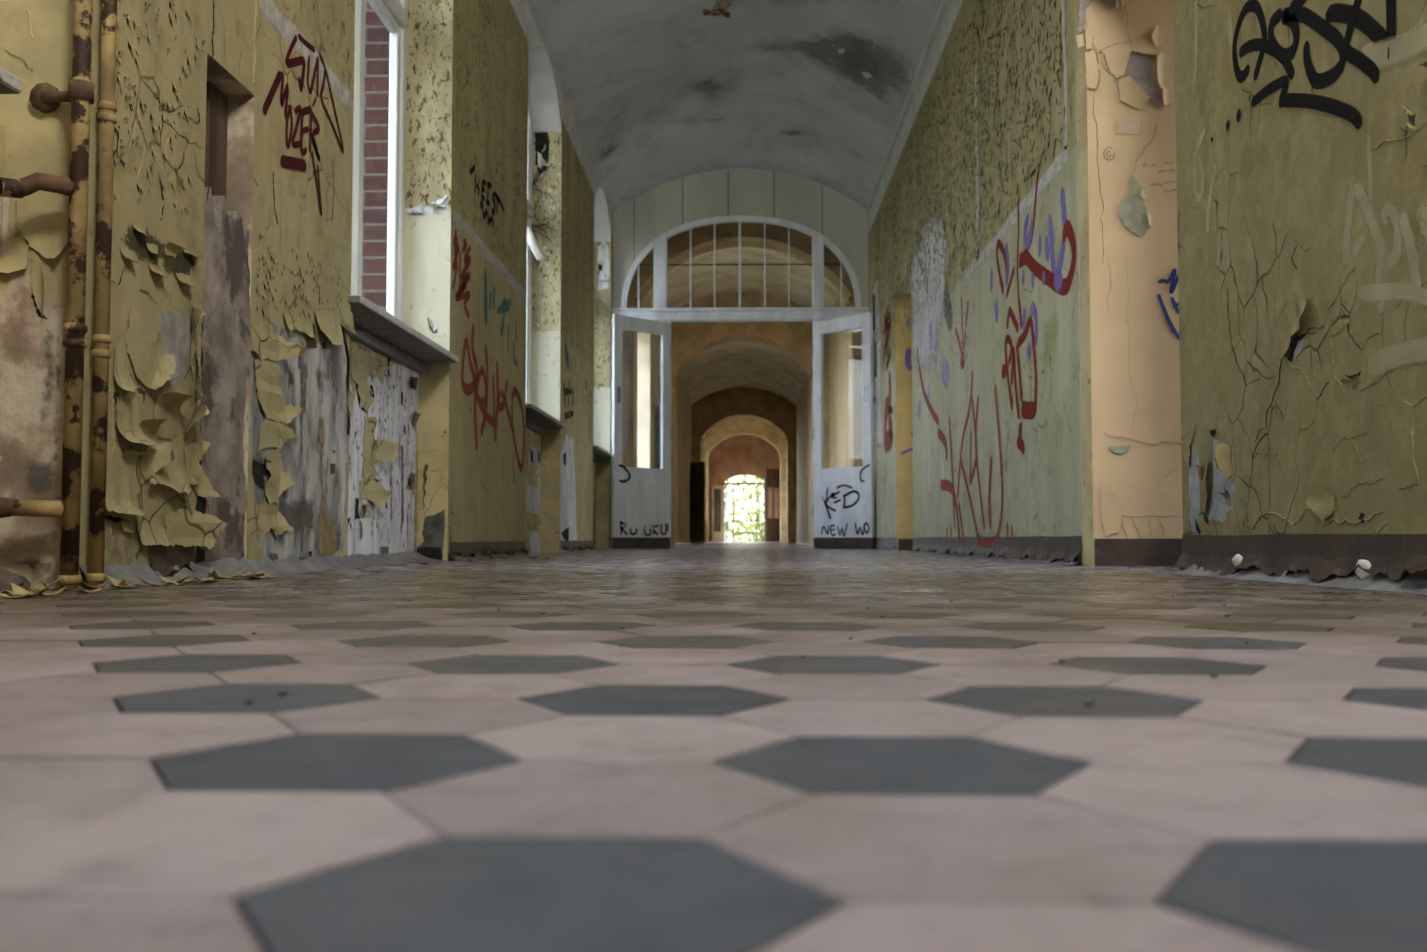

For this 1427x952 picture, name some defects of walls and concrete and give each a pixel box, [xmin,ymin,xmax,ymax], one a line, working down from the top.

crack [111,267,157,305]
crack [114,78,210,220]
peeling [104,0,227,566]
peeling [247,234,445,561]
damp [793,36,903,94]
peeling [872,0,1173,517]
peeling [1180,425,1236,535]
crack [1227,269,1427,534]